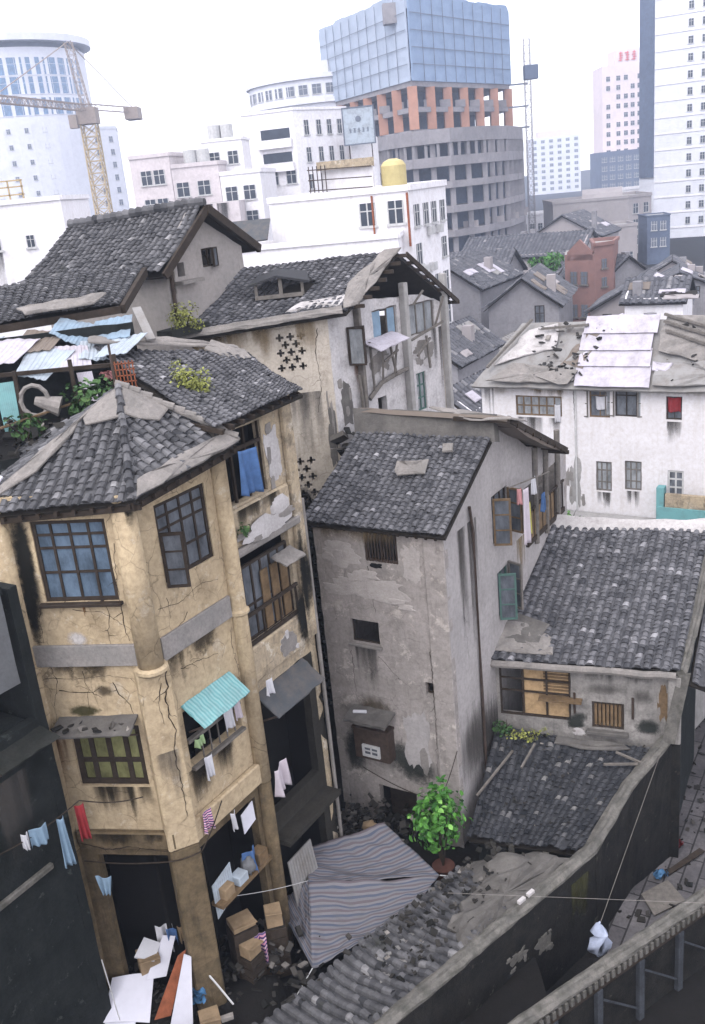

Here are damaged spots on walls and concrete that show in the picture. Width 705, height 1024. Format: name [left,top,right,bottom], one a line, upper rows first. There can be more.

spalling [263,422,282,490]
spalling [237,505,295,556]
damp [10,523,42,632]
crack [72,545,131,641]
spalling [322,540,422,611]
crack [46,627,239,815]
damp [361,700,387,710]
damp [347,734,363,764]
damp [394,745,432,779]
damp [95,787,150,799]
spalling [506,929,554,974]